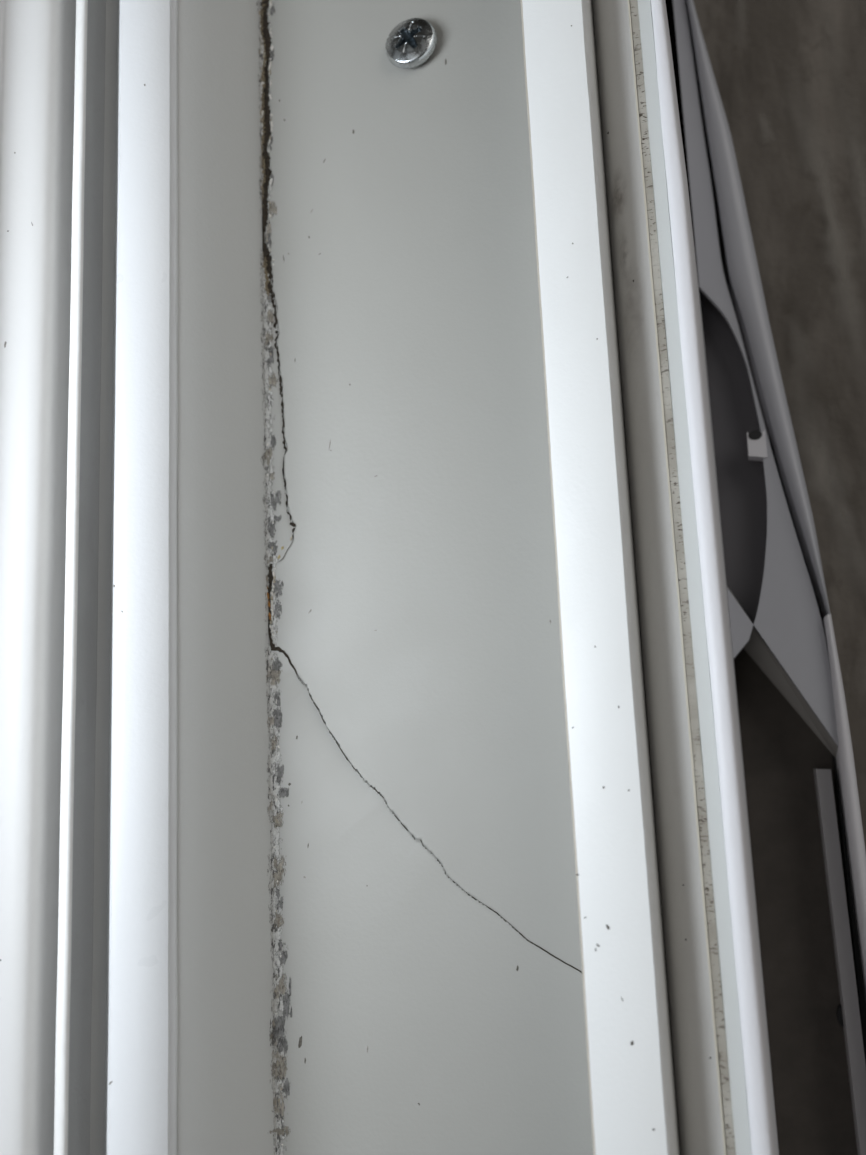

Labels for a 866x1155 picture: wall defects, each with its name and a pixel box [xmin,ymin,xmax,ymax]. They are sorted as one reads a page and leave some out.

peeling [257,0,292,1155]
crack [258,0,582,974]